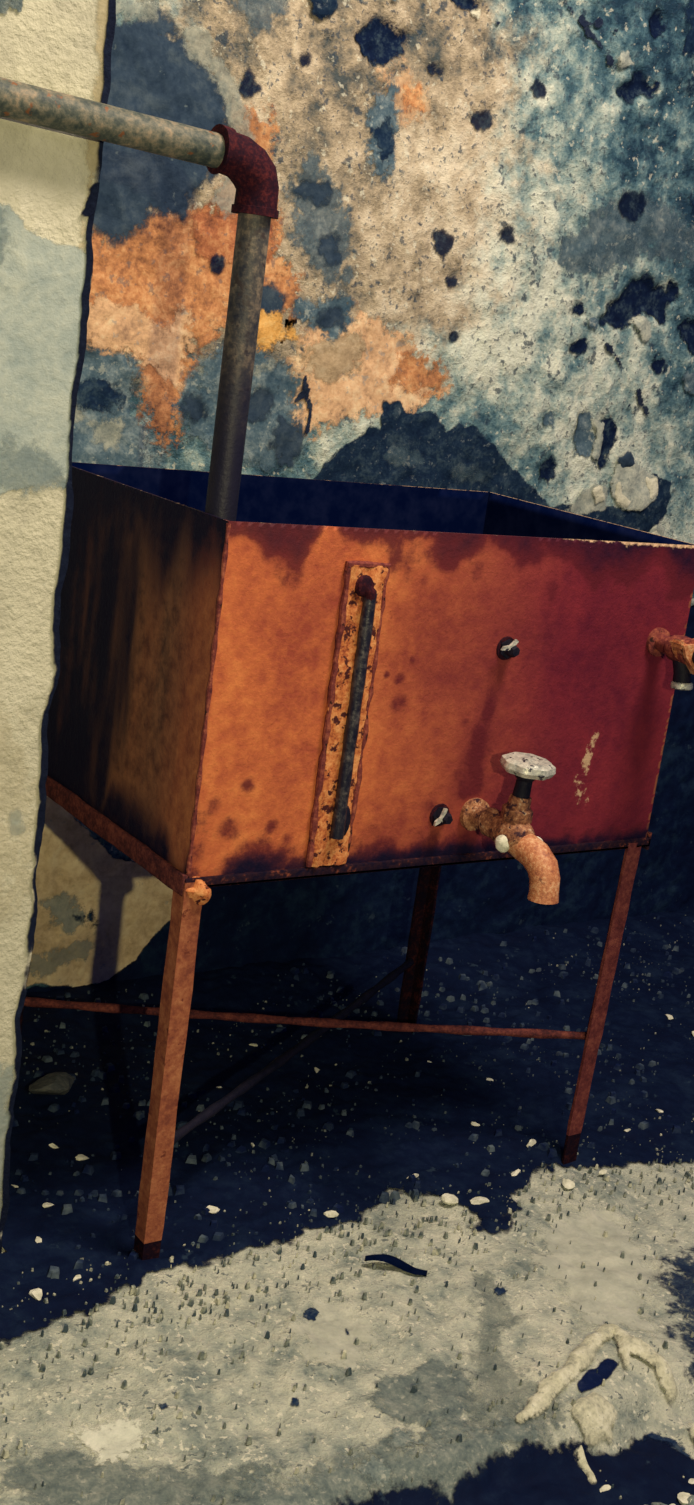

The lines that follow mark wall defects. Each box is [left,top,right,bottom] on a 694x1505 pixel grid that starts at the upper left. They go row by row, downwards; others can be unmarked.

damp [93,0,254,139]
damp [363,74,405,183]
damp [260,151,357,341]
rust [87,184,238,448]
damp [243,344,305,473]
damp [314,400,671,533]
damp [430,674,694,942]
damp [27,921,170,993]
damp [194,868,420,972]
damp [287,1299,383,1369]
damp [532,1204,694,1383]
damp [0,1359,566,1505]